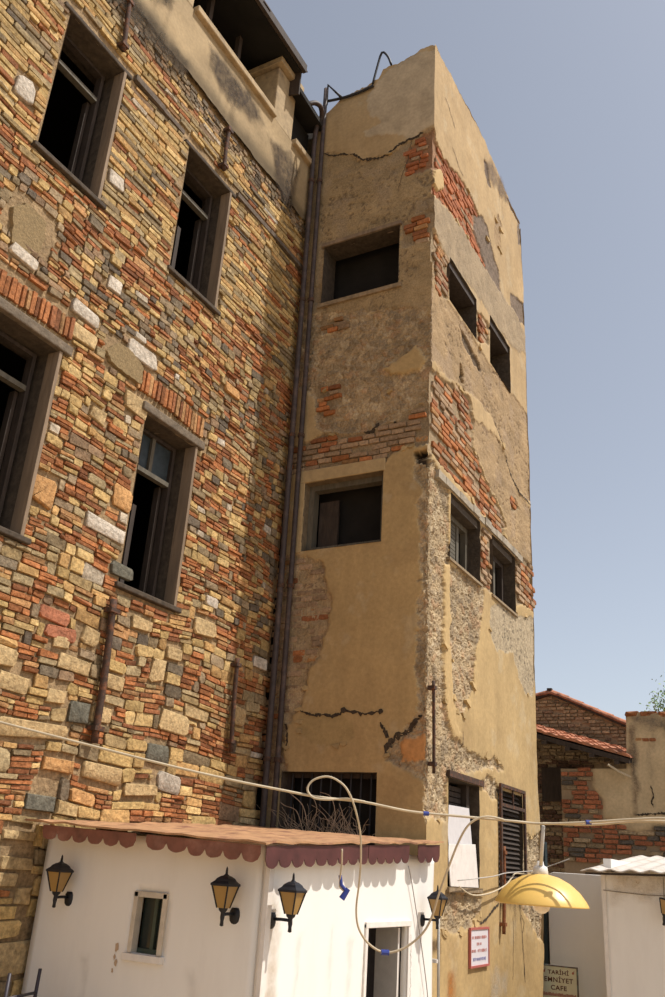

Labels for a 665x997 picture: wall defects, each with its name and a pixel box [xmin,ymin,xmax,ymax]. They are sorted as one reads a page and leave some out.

leakage [213,55,258,118]
spalling [286,49,536,823]
spalling [258,553,355,785]
crack [284,707,422,753]
spalling [561,767,665,863]
spalling [523,831,540,874]
spalling [440,890,483,938]
spalling [522,905,542,940]